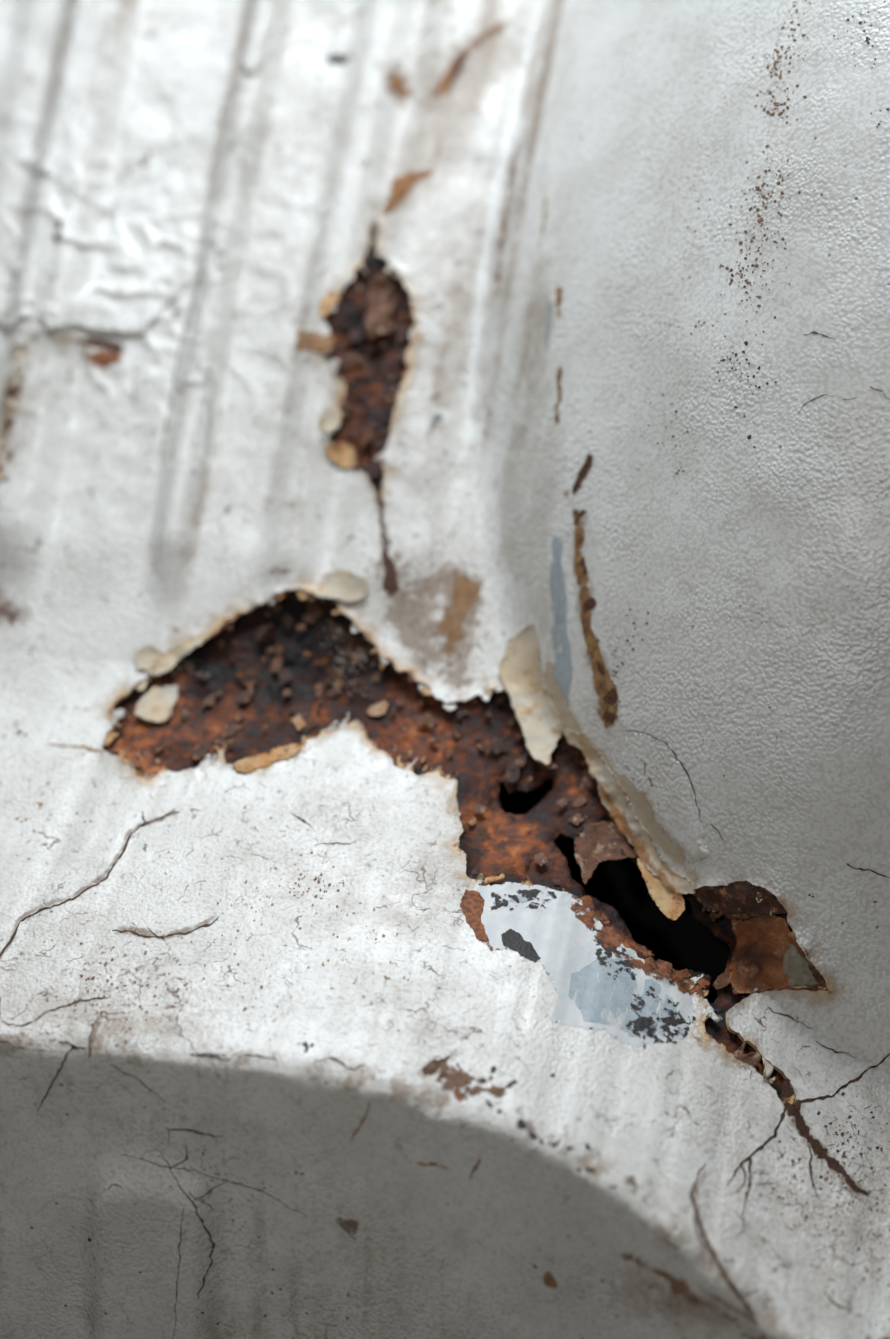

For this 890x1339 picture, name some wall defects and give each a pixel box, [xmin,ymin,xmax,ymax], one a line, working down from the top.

rust [296,170,432,503]
rust [554,367,563,424]
rust [366,532,491,686]
rust [550,454,649,728]
crack [0,811,179,956]
crack [112,916,219,939]
rust [46,838,410,1049]
rust [574,821,637,885]
rust [690,880,829,995]
rust [422,1055,517,1101]
crack [0,996,307,1339]
crack [663,1006,890,1325]